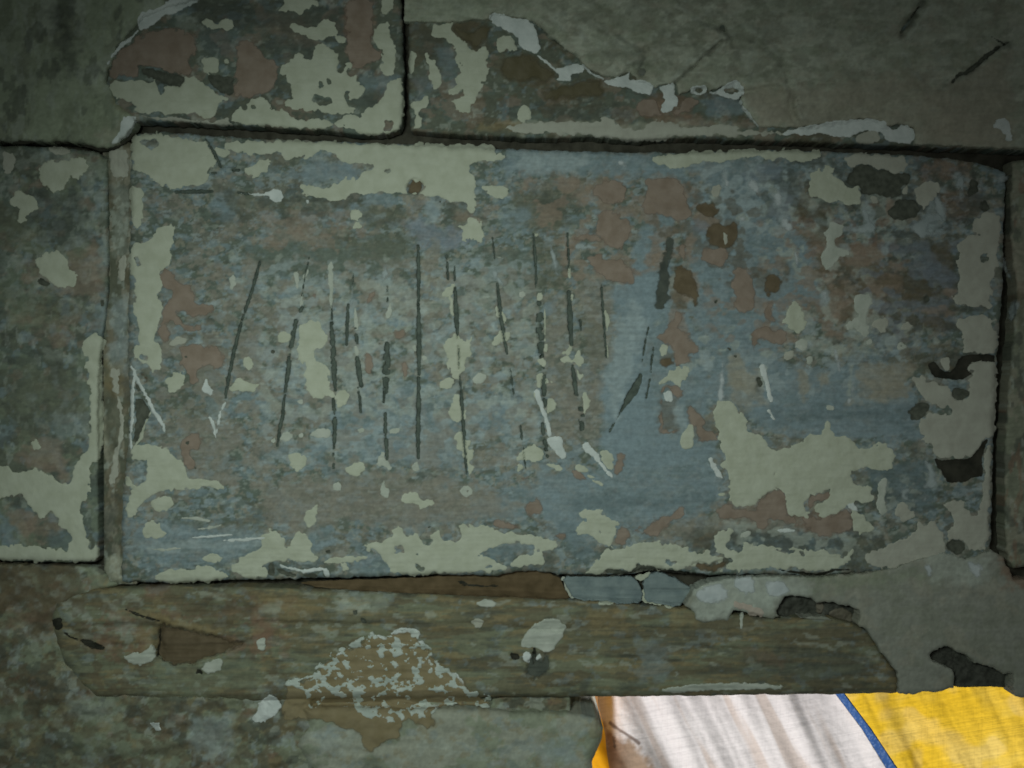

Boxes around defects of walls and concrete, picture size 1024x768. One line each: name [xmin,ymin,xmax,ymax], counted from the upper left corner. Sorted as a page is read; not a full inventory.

peeling [2,151,16,174]
peeling [10,190,39,223]
peeling [39,146,89,193]
peeling [109,0,517,243]
peeling [505,105,946,238]
peeling [0,224,224,564]
peeling [155,180,1011,628]
spalling [930,646,1006,687]